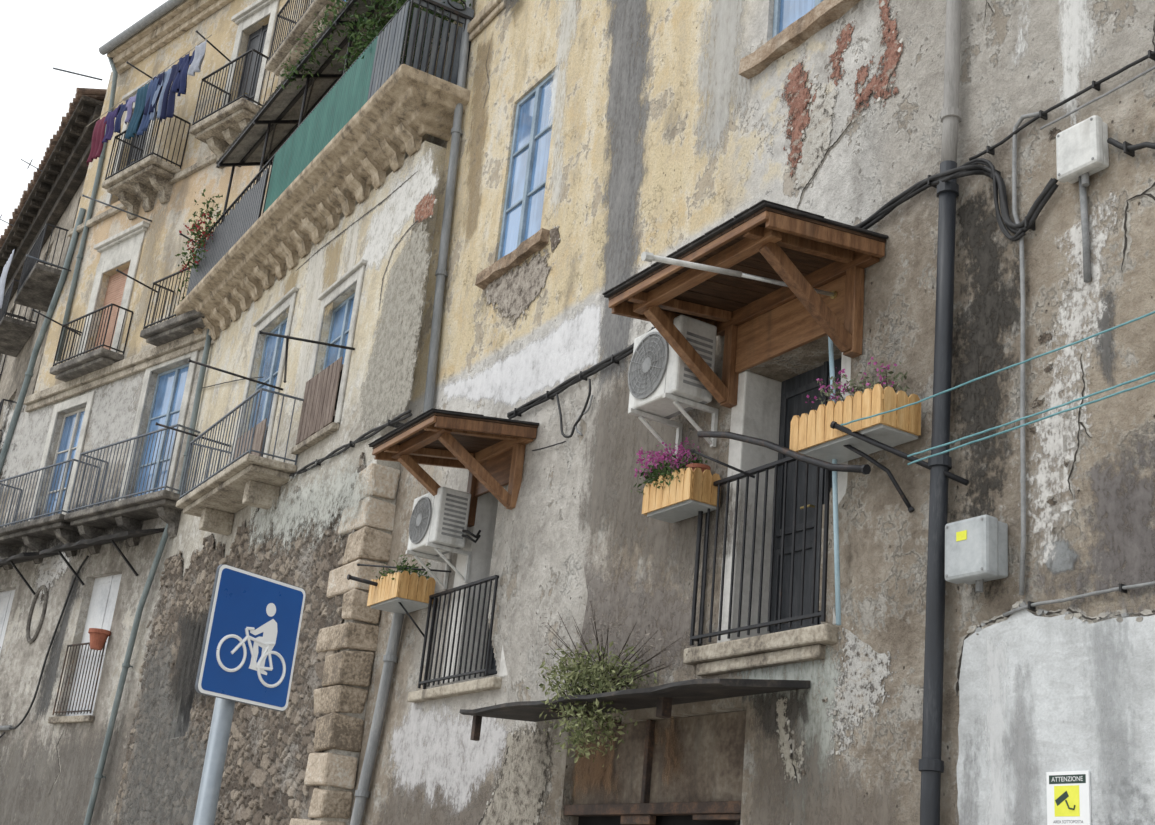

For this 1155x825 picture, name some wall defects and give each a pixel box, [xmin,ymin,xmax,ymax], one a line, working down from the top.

spalling [779,0,905,195]
spalling [414,192,437,224]
spalling [485,226,561,326]
crack [1121,181,1155,271]
damp [951,186,1029,518]
crack [1067,354,1092,499]
crack [953,599,1155,696]
spalling [967,601,1153,635]
spalling [776,697,808,783]
spalling [822,627,899,770]